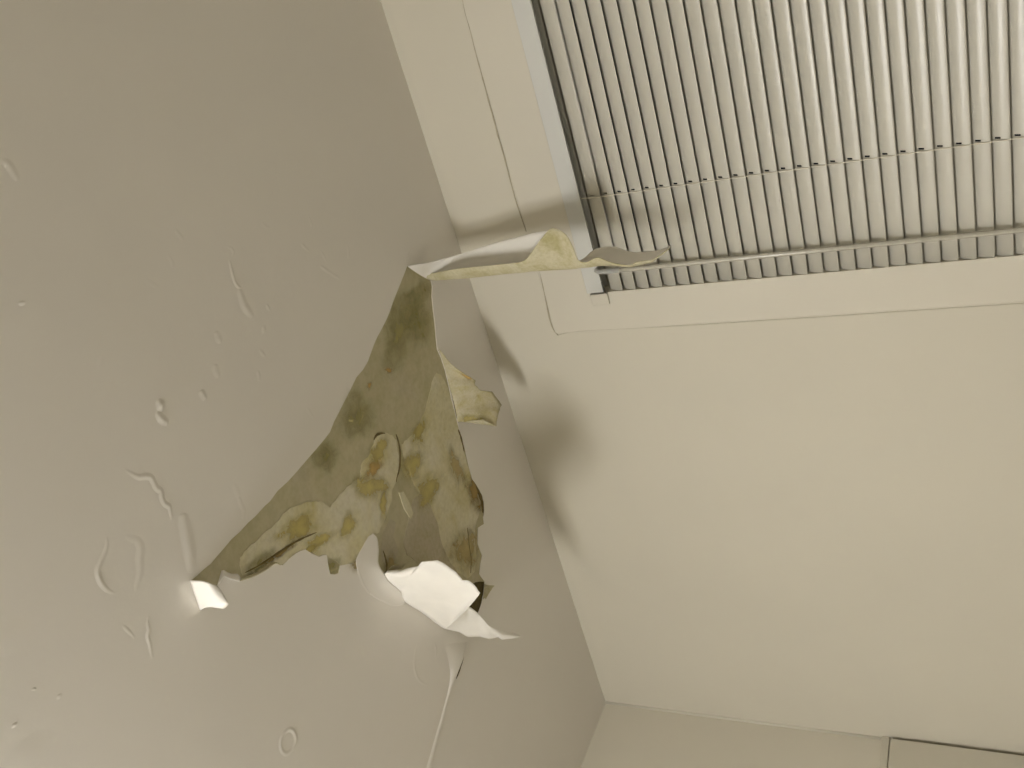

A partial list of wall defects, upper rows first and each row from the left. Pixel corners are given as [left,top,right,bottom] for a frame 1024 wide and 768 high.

peeling [192,267,494,613]